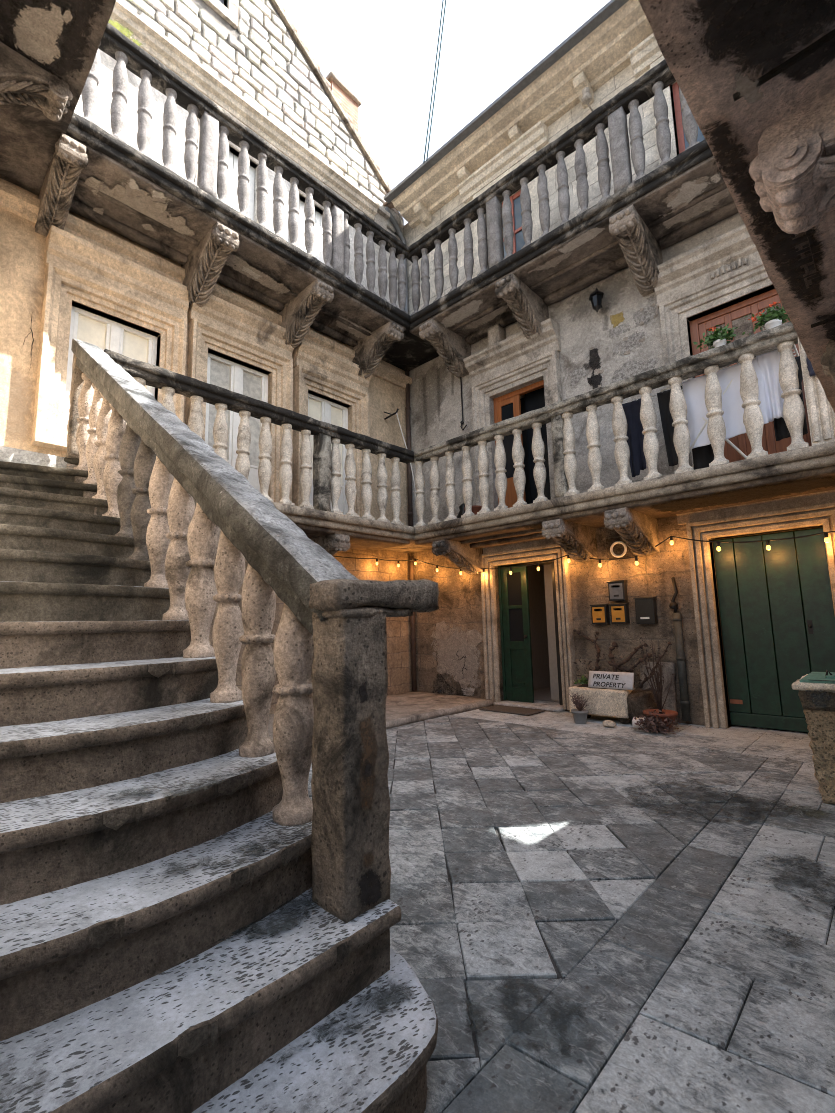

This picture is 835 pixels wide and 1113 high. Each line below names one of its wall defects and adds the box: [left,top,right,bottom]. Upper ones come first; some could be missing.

spalling [12,3,73,65]
leakage [683,0,835,103]
flaking render [84,175,195,237]
leakage [701,120,835,341]